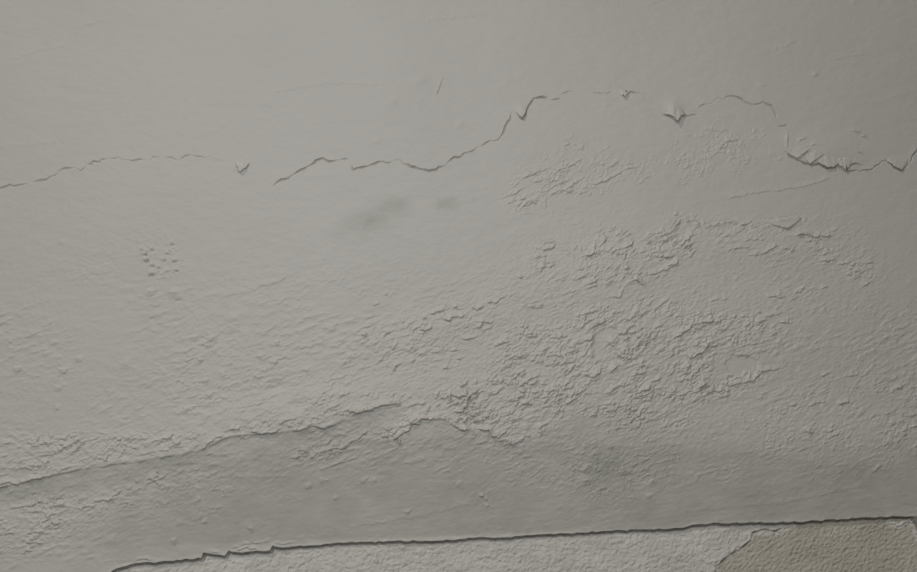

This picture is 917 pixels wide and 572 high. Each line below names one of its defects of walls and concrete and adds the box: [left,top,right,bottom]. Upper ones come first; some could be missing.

crack [0,153,225,192]
crack [269,88,653,191]
crack [684,93,792,150]
peeling [722,126,917,203]
peeling [0,370,565,493]
spalling [105,513,917,572]